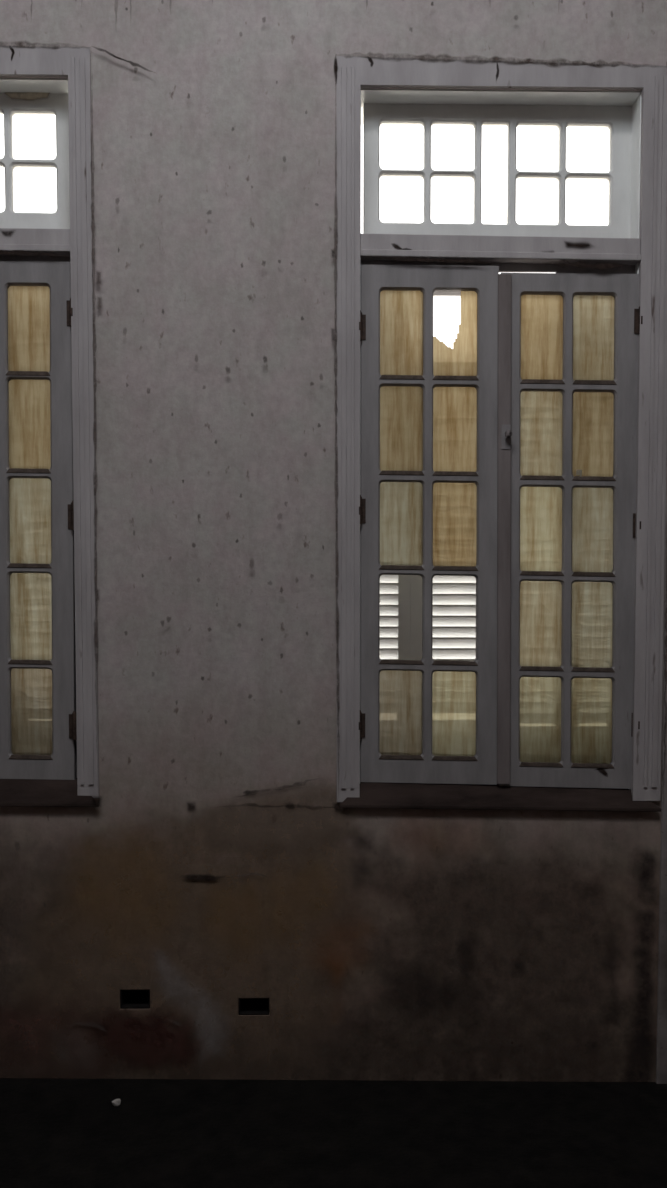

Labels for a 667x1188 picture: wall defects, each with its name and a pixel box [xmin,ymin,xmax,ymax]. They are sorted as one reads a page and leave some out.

crack [0,42,58,60]
crack [97,48,150,71]
water stain [0,823,374,1080]